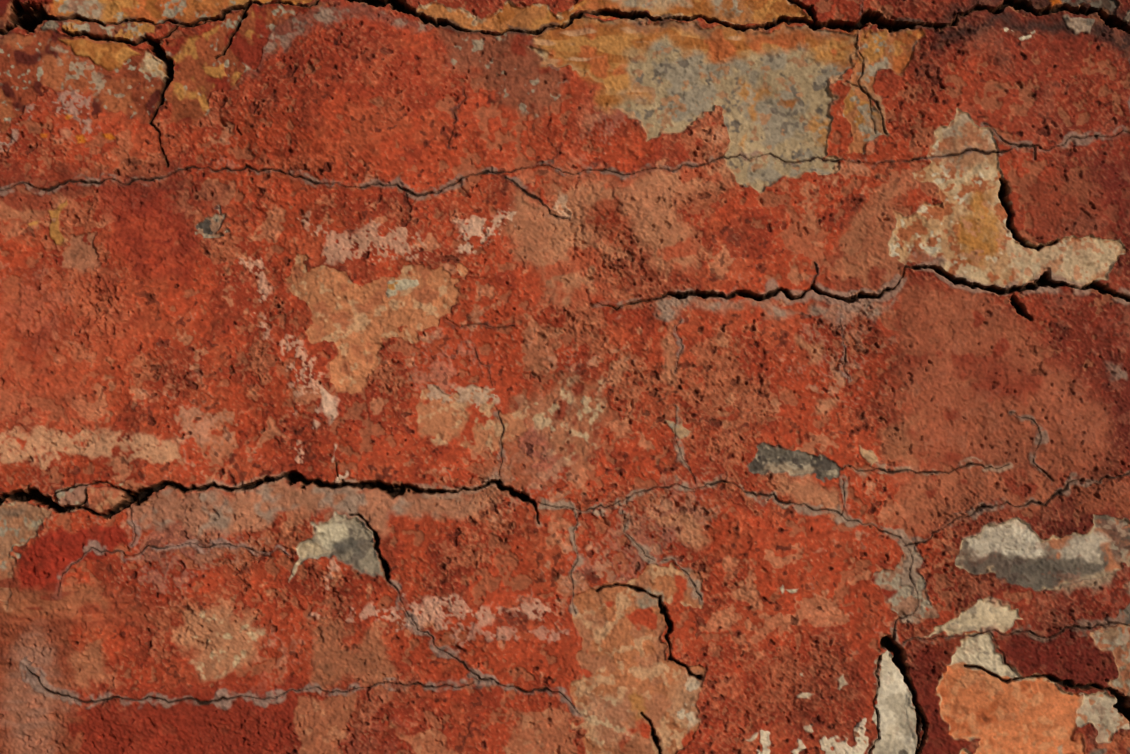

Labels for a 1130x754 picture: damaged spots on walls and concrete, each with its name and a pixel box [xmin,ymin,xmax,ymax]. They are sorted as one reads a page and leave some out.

flaking render [0,0,312,132]
peeling [416,0,925,193]
crack [0,0,1130,386]
peeling [888,109,1126,287]
flaking render [289,515,383,580]
crack [0,403,1130,754]
flaking render [748,441,841,483]
peeling [871,551,1130,754]
flaking render [955,515,1130,591]